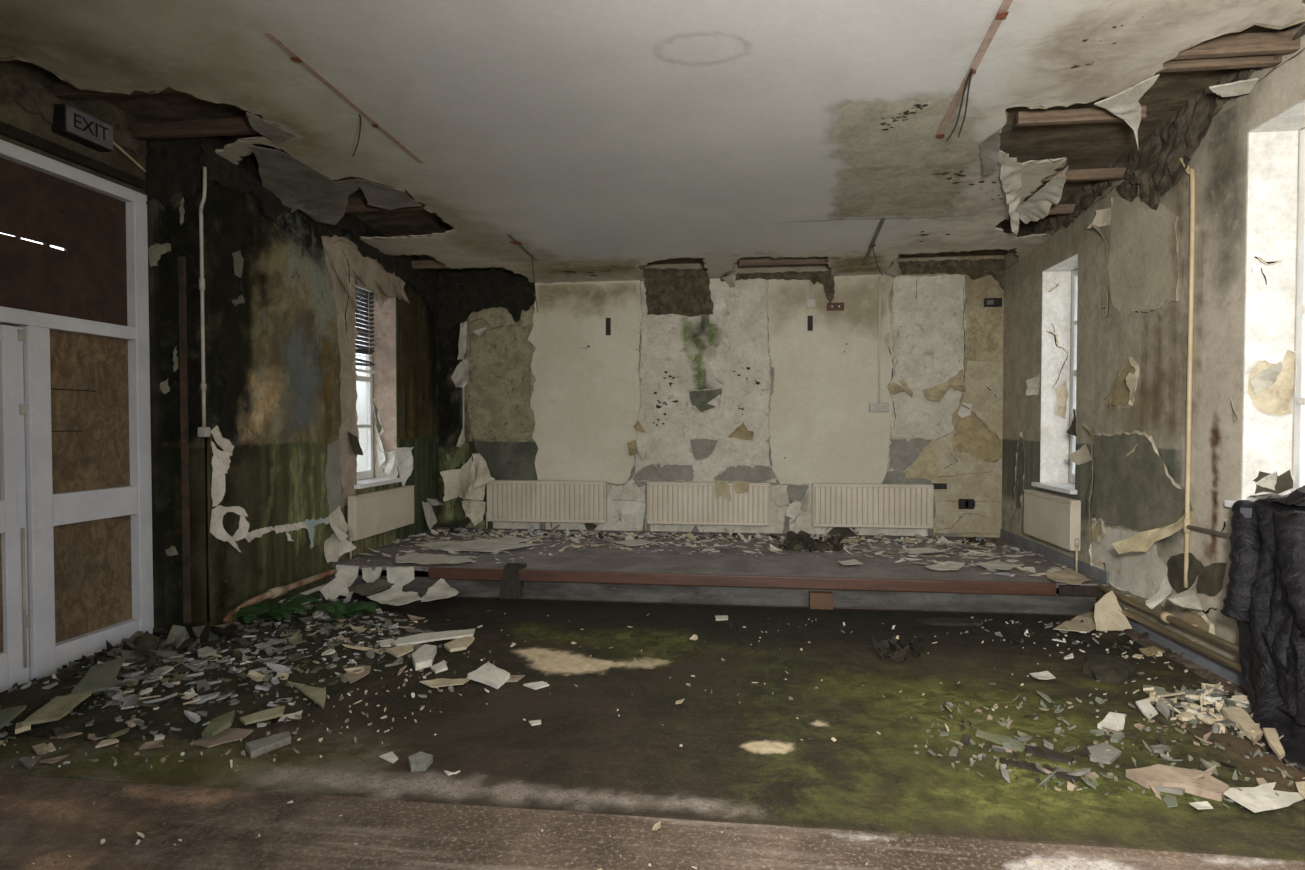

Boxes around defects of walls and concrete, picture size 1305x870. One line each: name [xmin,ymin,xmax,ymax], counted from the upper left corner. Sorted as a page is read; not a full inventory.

damp [831,96,973,218]
peeling [933,171,1003,200]
peeling [145,136,538,480]
spalling [643,268,835,319]
damp [152,180,331,626]
flaking render [324,399,1070,576]
peeling [627,367,775,484]
peeling [887,369,1026,510]
peeling [1026,374,1194,554]
peeling [1245,348,1297,419]
spalling [1145,553,1226,645]